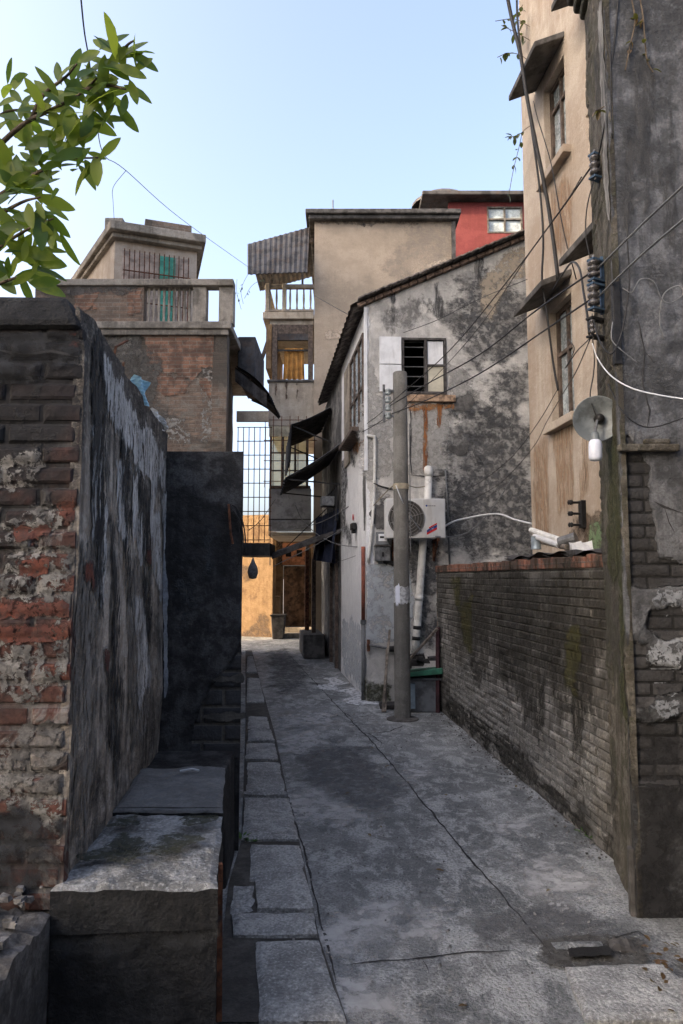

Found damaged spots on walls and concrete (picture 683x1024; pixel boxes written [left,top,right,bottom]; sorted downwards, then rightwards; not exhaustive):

flaking render [0,448,46,493]
flaking render [0,503,74,704]
leakage [91,329,167,793]
flaking render [92,335,214,712]
rust [409,403,454,470]
leakage [409,257,587,648]
leakage [571,511,602,547]
spalling [626,435,683,786]
flaking render [0,719,65,838]
crack [288,797,510,983]
crack [290,656,549,951]